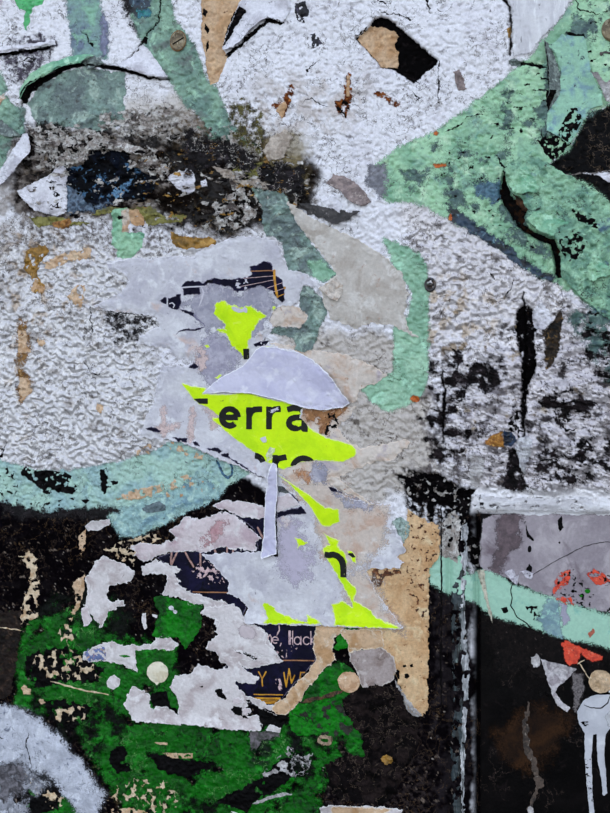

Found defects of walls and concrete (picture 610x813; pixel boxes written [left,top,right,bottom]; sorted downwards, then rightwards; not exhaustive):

flaking render [356,18,438,83]
crack [503,0,547,69]
corrosion [271,84,295,118]
corrosion [334,72,353,118]
peeling [132,442,205,462]
peeling [100,468,118,494]
peeling [116,474,204,501]
peeling [78,529,86,554]
peeling [103,533,161,567]
peeling [392,517,410,543]
flaking render [398,473,481,566]